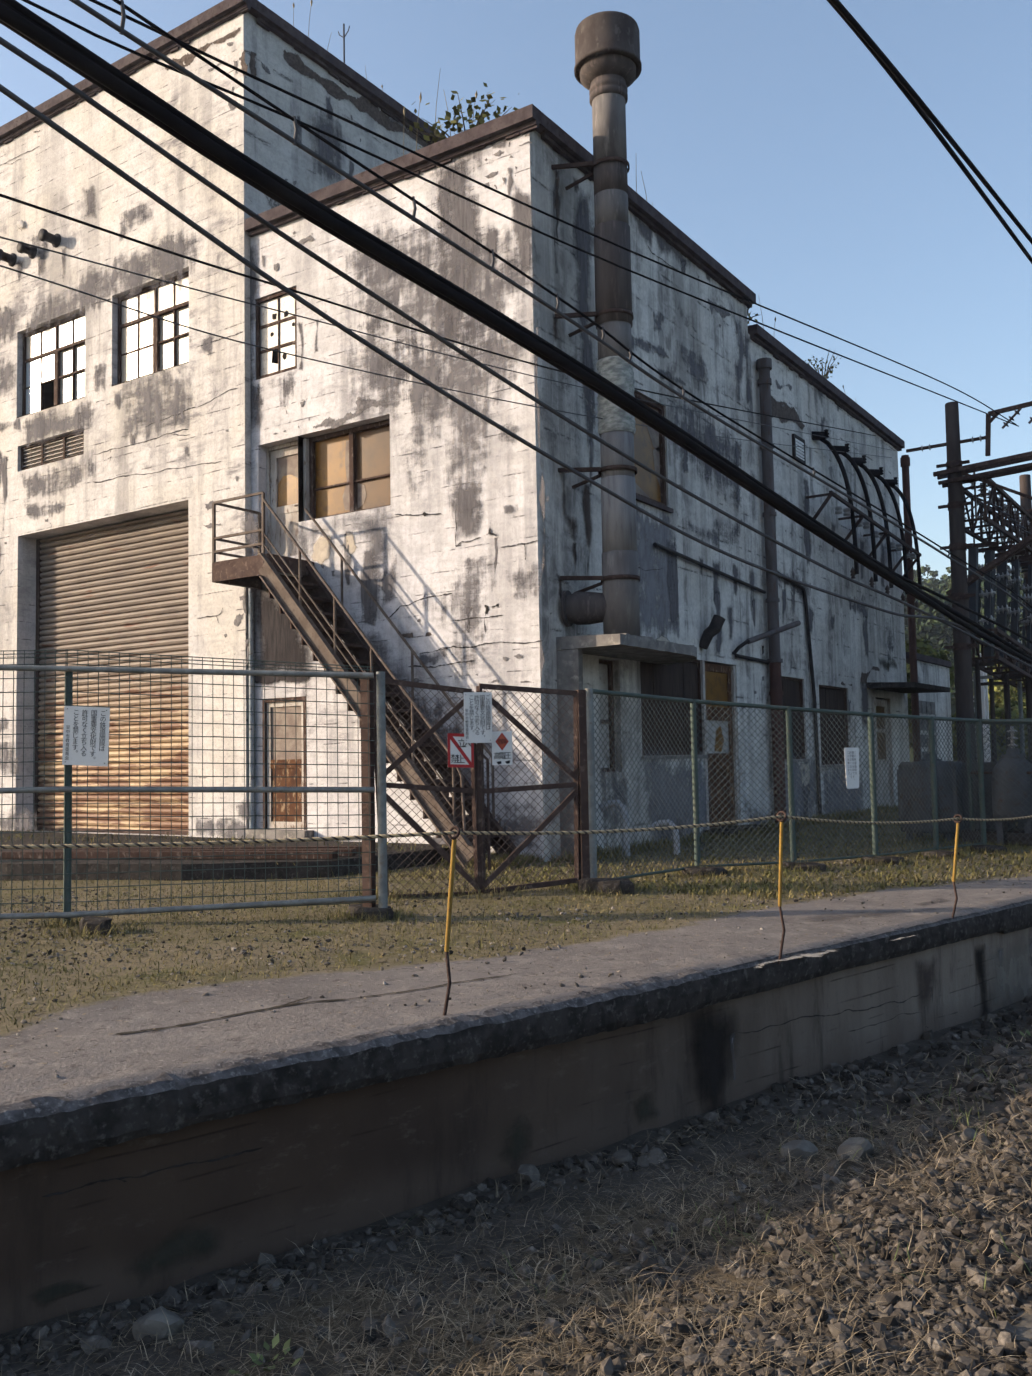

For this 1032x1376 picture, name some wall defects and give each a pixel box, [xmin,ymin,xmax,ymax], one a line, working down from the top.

peeling [165,28,270,110]
peeling [283,50,430,147]
leakage [374,140,534,312]
leakage [573,196,595,486]
leakage [0,403,93,447]
leakage [114,369,192,444]
leakage [346,250,540,537]
leakage [0,452,96,524]
crack [117,973,516,1034]
leakage [976,940,1032,1016]
leakage [693,1013,735,1108]